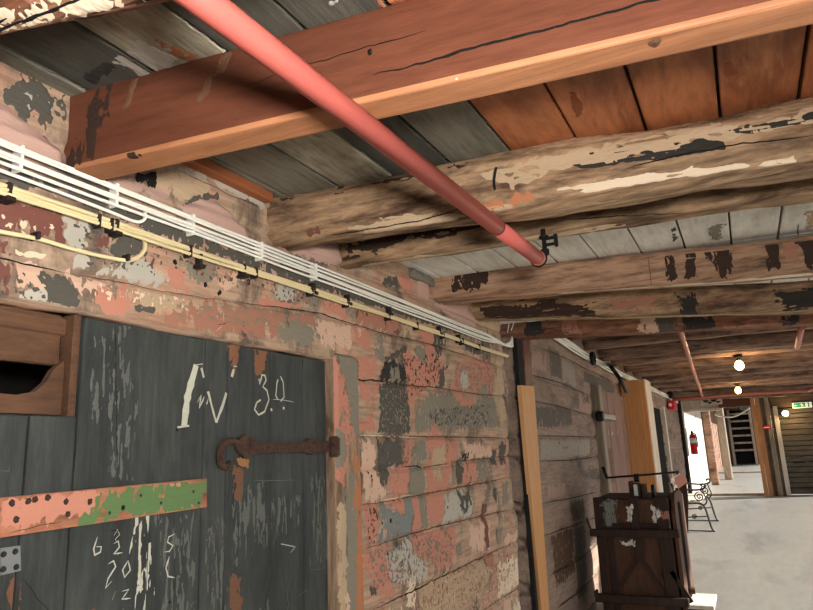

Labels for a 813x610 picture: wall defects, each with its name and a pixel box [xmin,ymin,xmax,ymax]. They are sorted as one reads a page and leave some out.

peeling [0,0,124,34]
peeling [112,38,197,76]
crack [374,0,658,75]
peeling [108,166,265,210]
peeling [481,107,813,211]
peeling [0,201,521,610]